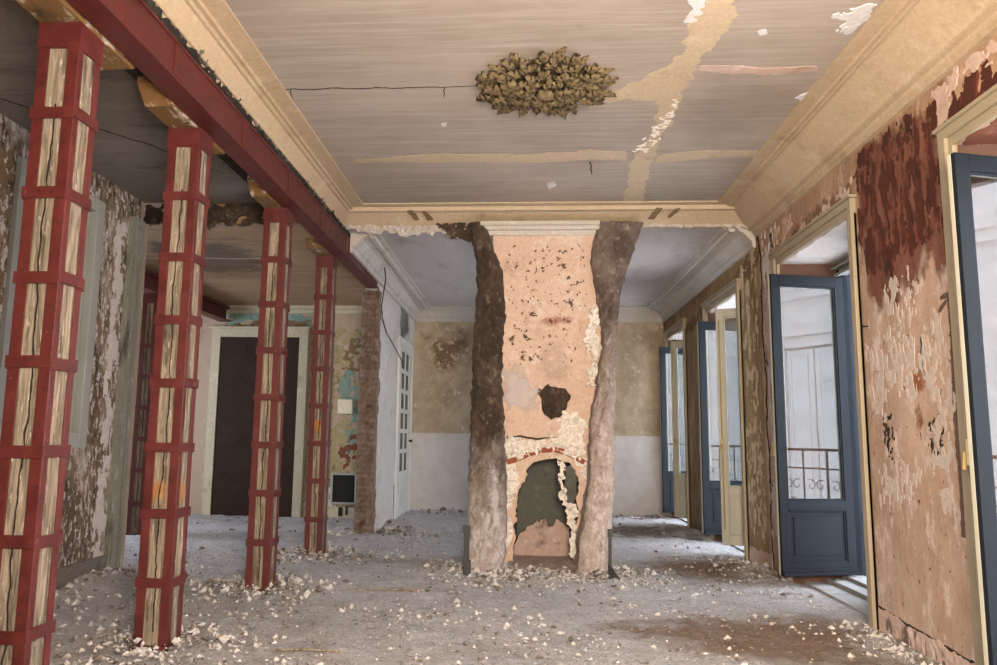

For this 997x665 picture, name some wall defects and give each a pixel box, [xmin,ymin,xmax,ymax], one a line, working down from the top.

peeling [354,0,818,202]
peeling [831,3,877,35]
flaking render [0,145,16,317]
flaking render [341,334,361,372]
peeling [739,40,997,544]
flaking render [338,429,357,473]
flaking render [504,384,588,558]